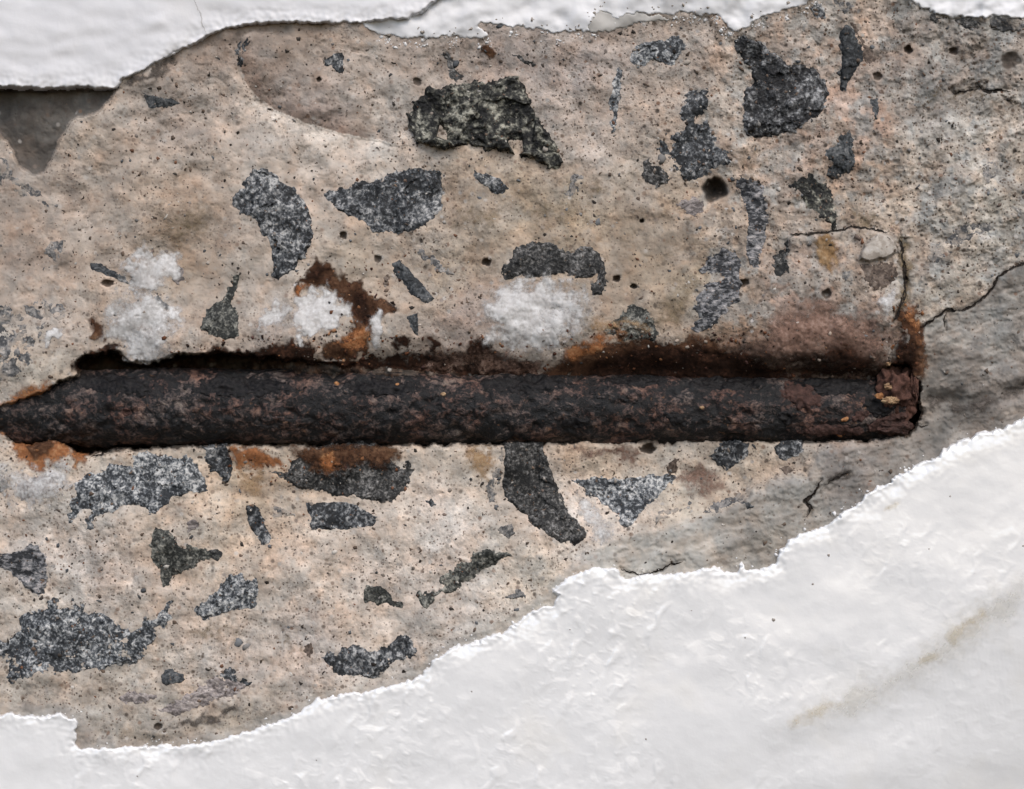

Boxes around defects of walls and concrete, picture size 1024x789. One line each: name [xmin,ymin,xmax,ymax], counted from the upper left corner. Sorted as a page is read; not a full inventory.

spalling [0,0,1024,406]
rust [71,317,119,373]
damp [106,248,182,364]
damp [258,284,350,346]
damp [370,309,383,348]
damp [484,276,587,352]
crack [792,225,1024,328]
rust [1,381,51,406]
spalling [909,396,922,428]
peeling [0,417,1024,789]